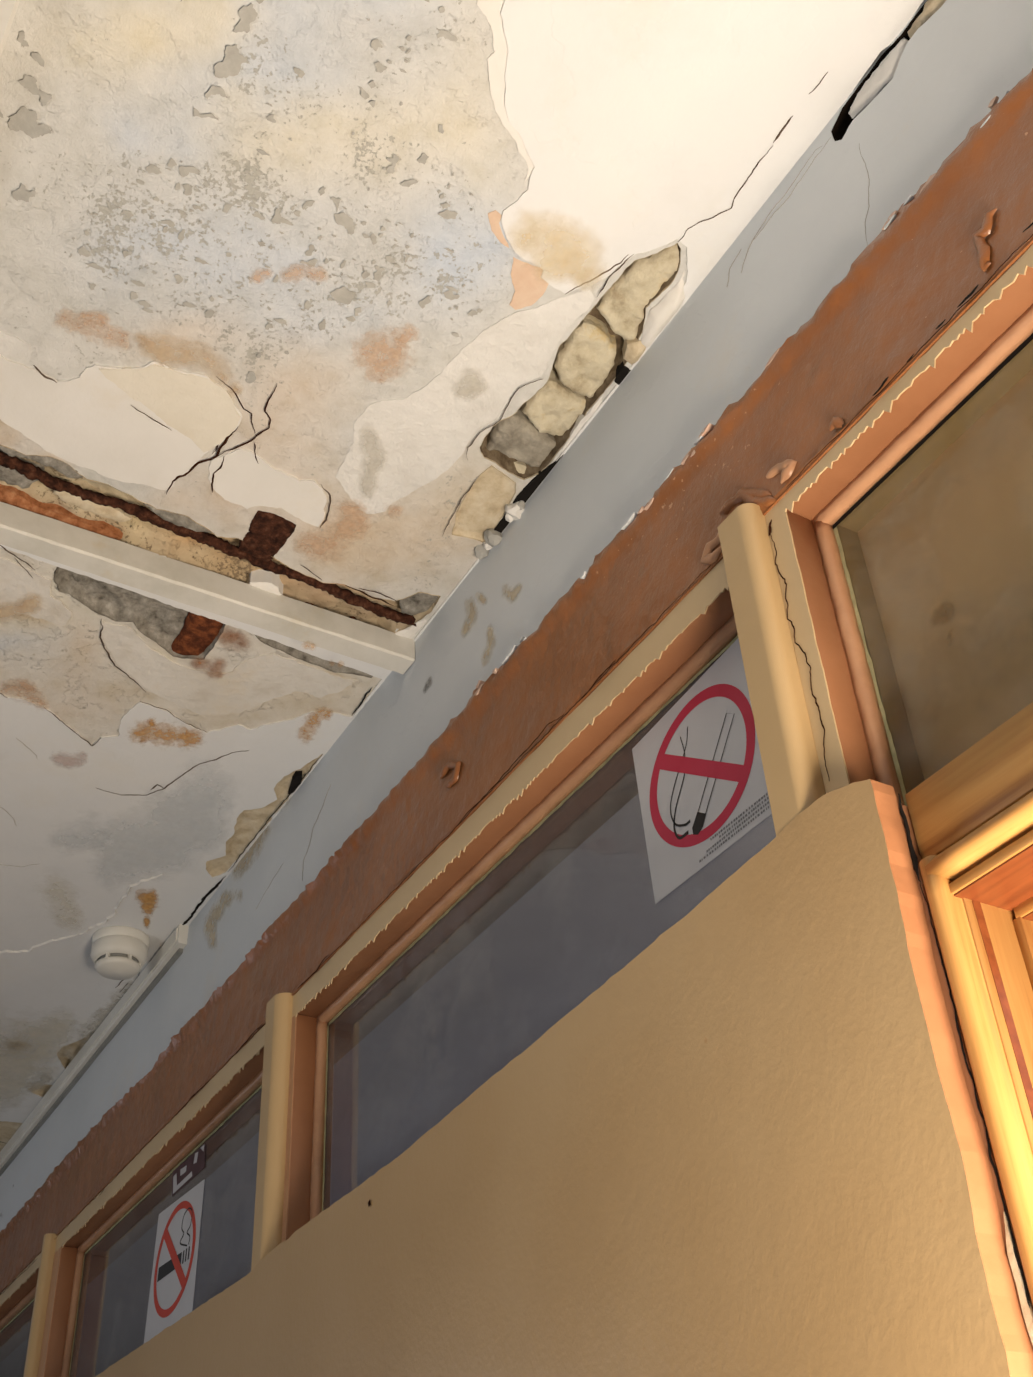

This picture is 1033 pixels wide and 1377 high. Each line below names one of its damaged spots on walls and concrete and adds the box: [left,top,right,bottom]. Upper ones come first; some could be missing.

peeling [980,91,1009,128]
peeling [0,0,688,641]
crack [786,222,1033,488]
peeling [621,423,715,530]
crack [97,619,249,796]
peeling [0,548,382,745]
crack [182,754,331,925]
flaking render [206,754,322,878]
peeling [474,637,526,696]
crack [298,565,711,988]
crack [768,519,830,781]
crack [0,1026,261,1295]